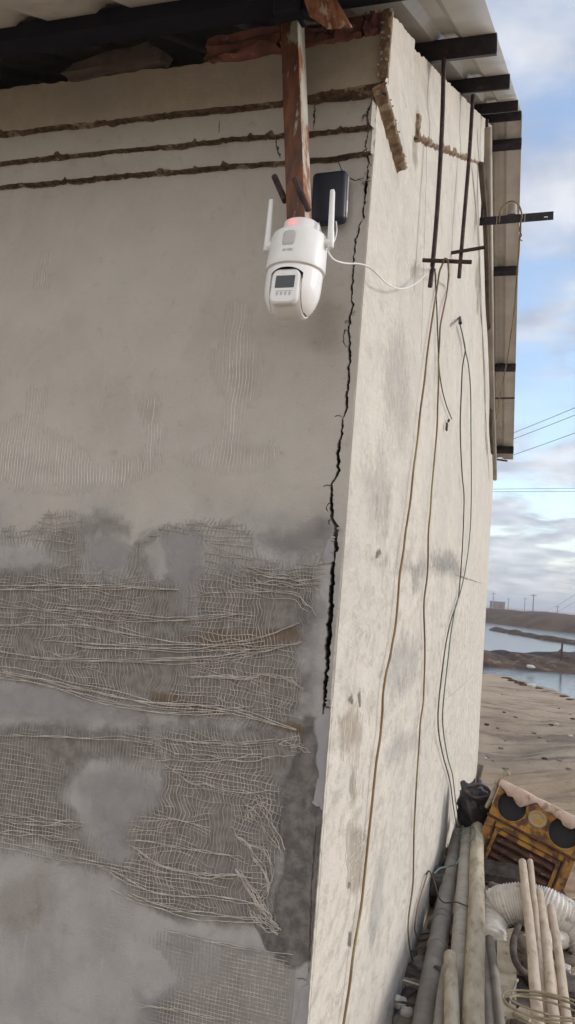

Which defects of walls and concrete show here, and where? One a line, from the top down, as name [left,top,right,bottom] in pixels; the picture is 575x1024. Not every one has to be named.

crack [321,98,372,715]
peeling [323,536,334,564]
spalling [254,712,330,968]
peeling [294,984,310,1024]